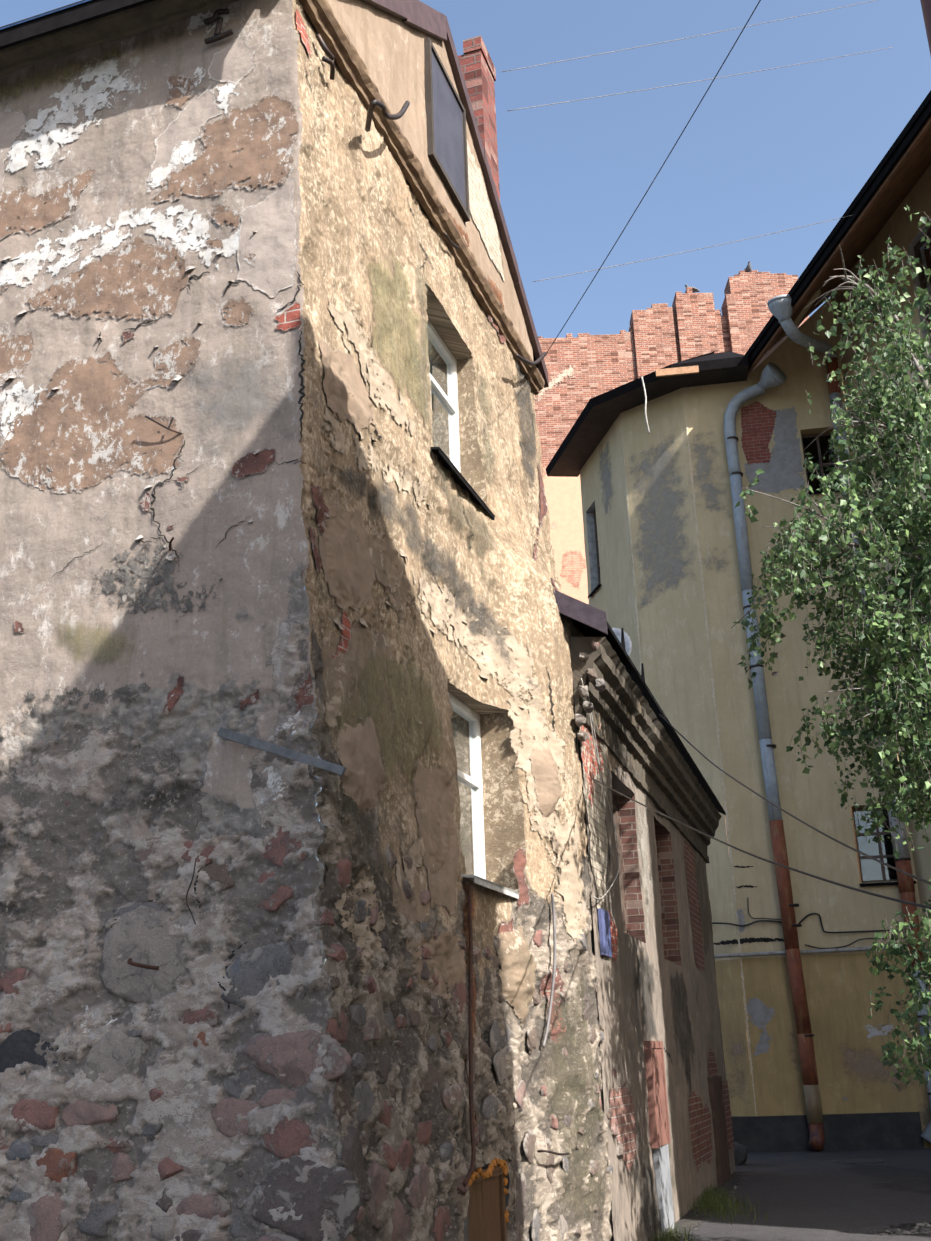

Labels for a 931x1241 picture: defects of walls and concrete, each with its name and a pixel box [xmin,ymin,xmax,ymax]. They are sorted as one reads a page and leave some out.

peeling [0,4,302,511]
crack [135,440,204,567]
spalling [533,463,556,561]
peeling [694,444,722,510]
peeling [741,401,805,494]
spalling [0,485,637,1241]
peeling [746,997,776,1057]